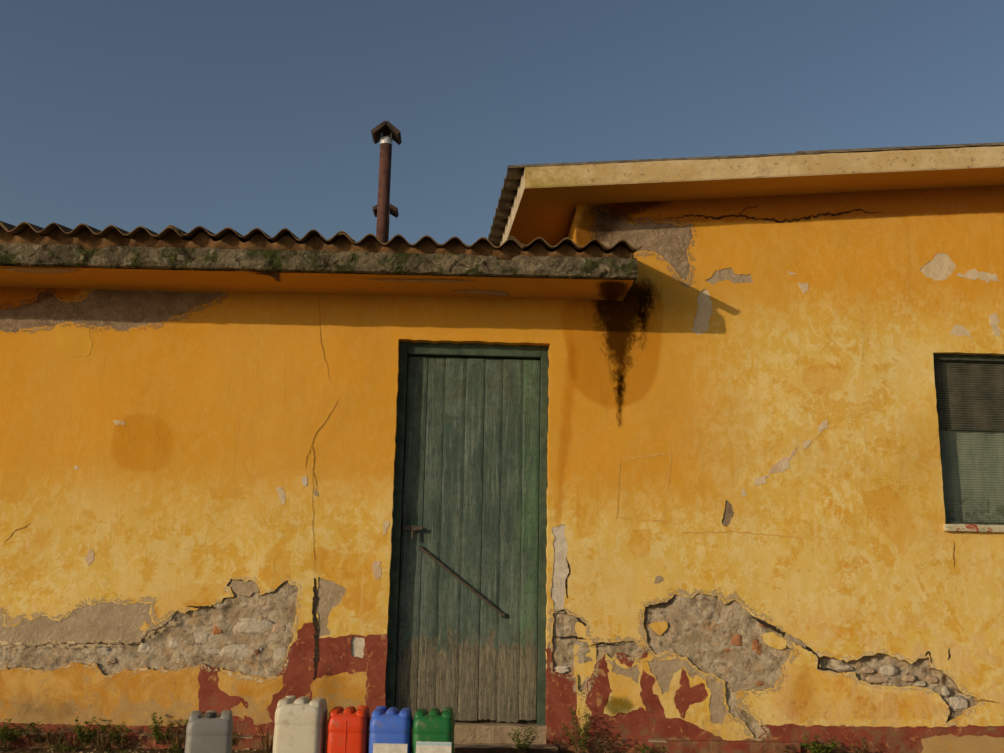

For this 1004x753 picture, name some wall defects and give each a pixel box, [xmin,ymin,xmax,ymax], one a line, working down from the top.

crack [669,205,883,223]
peeling [586,204,753,335]
peeling [919,253,1001,283]
peeling [0,288,229,334]
leakage [593,282,652,423]
crack [302,295,338,680]
flaking render [0,576,301,683]
peeling [316,577,347,636]
flaking render [351,636,365,658]
flaking render [547,525,799,741]
flaking render [813,648,999,726]